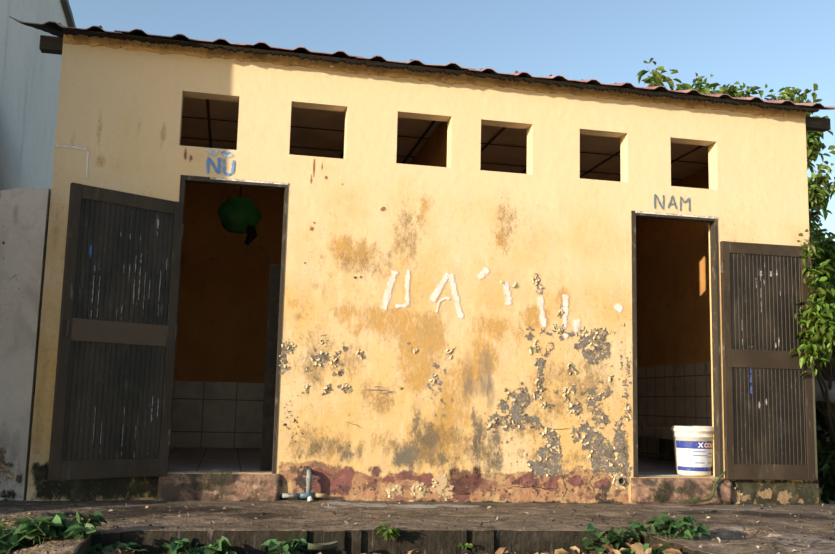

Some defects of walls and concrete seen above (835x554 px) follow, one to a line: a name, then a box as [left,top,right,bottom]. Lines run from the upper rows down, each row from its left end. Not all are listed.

peeling [279,339,296,375]
peeling [283,300,633,502]
leakage [0,475,22,500]
leakage [32,462,292,519]
leakage [647,479,834,520]